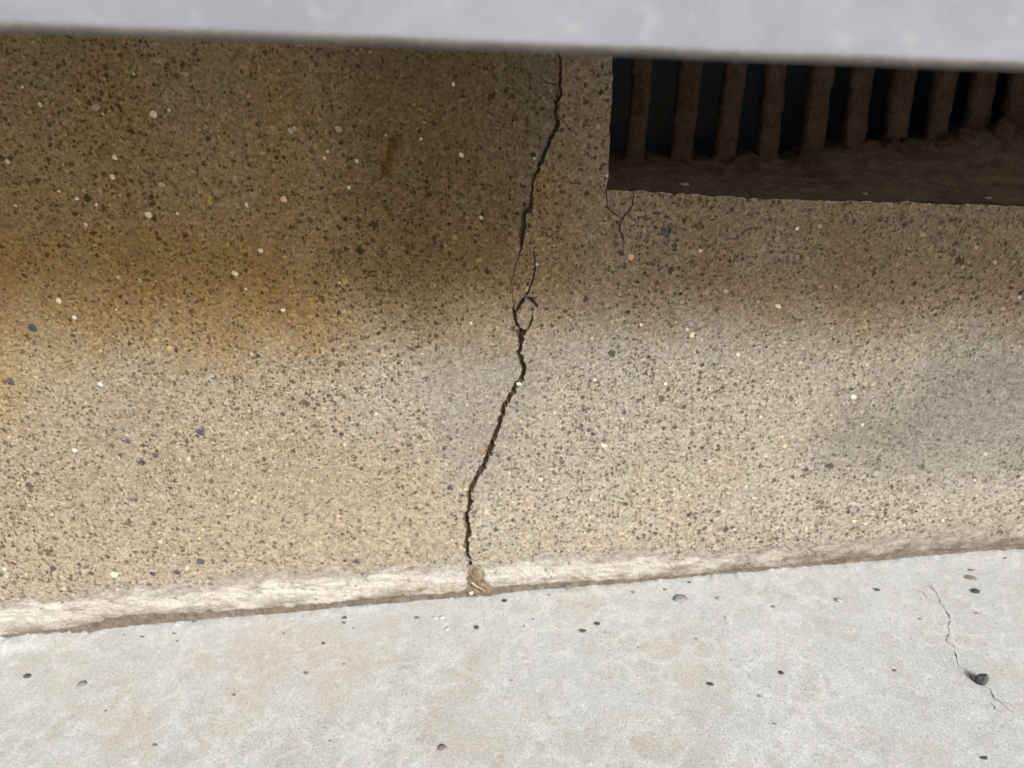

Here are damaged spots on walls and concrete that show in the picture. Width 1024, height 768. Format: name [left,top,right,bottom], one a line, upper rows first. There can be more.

crack [463,54,565,566]
crack [909,583,1013,712]